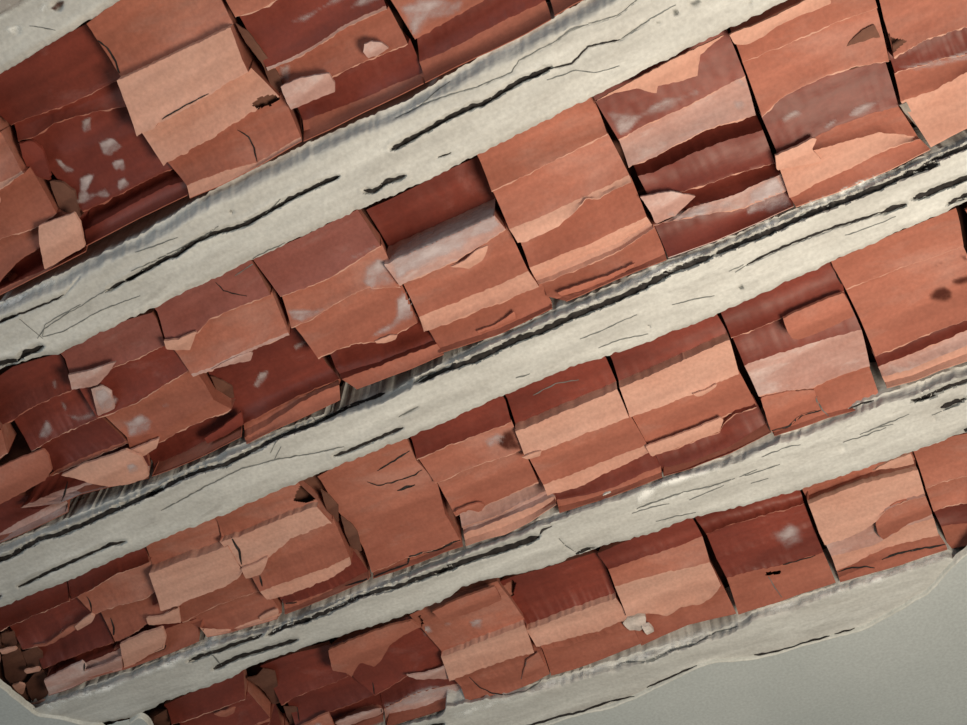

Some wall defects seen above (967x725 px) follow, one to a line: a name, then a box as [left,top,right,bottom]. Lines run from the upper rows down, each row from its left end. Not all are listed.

crack [392,0,675,150]
peeling [594,0,831,102]
peeling [775,137,822,170]
peeling [39,176,92,269]
crack [0,176,339,365]
crack [418,144,967,383]
peeling [62,437,160,487]
crack [0,393,422,562]
peeling [646,416,723,456]
crack [843,379,967,443]
peeling [120,606,248,677]
crack [189,526,593,669]